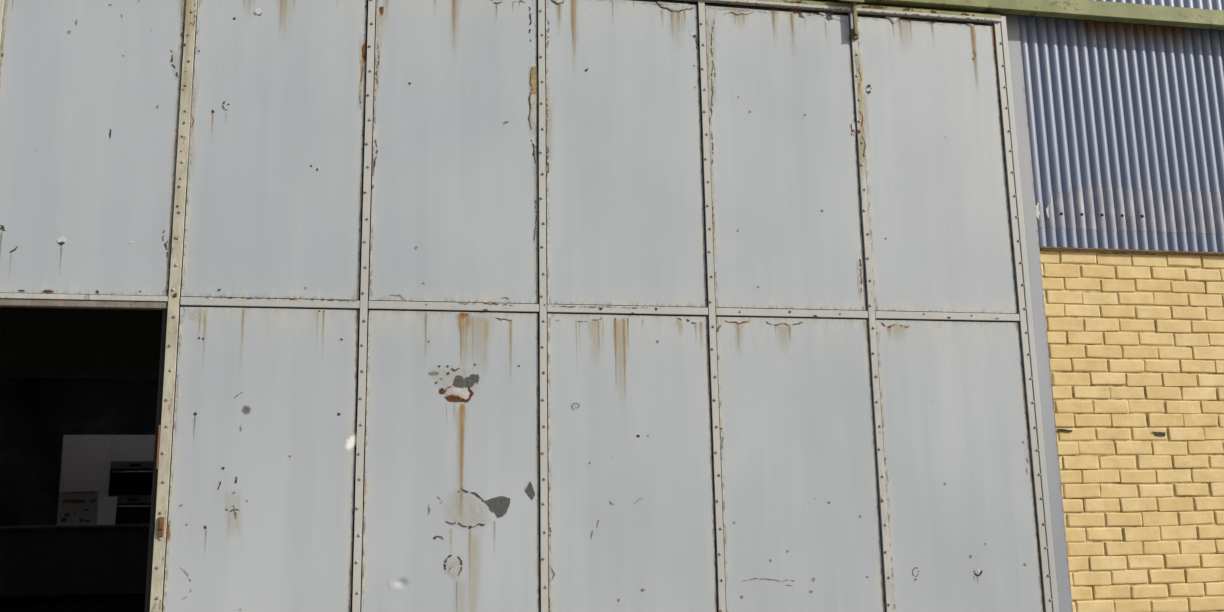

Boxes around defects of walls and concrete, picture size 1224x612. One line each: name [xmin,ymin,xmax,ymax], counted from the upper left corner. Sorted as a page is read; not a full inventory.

rust [576,318,625,361]
peeling [429,363,480,402]
peeling [525,481,535,500]
peeling [434,488,510,540]
peeling [444,555,463,576]